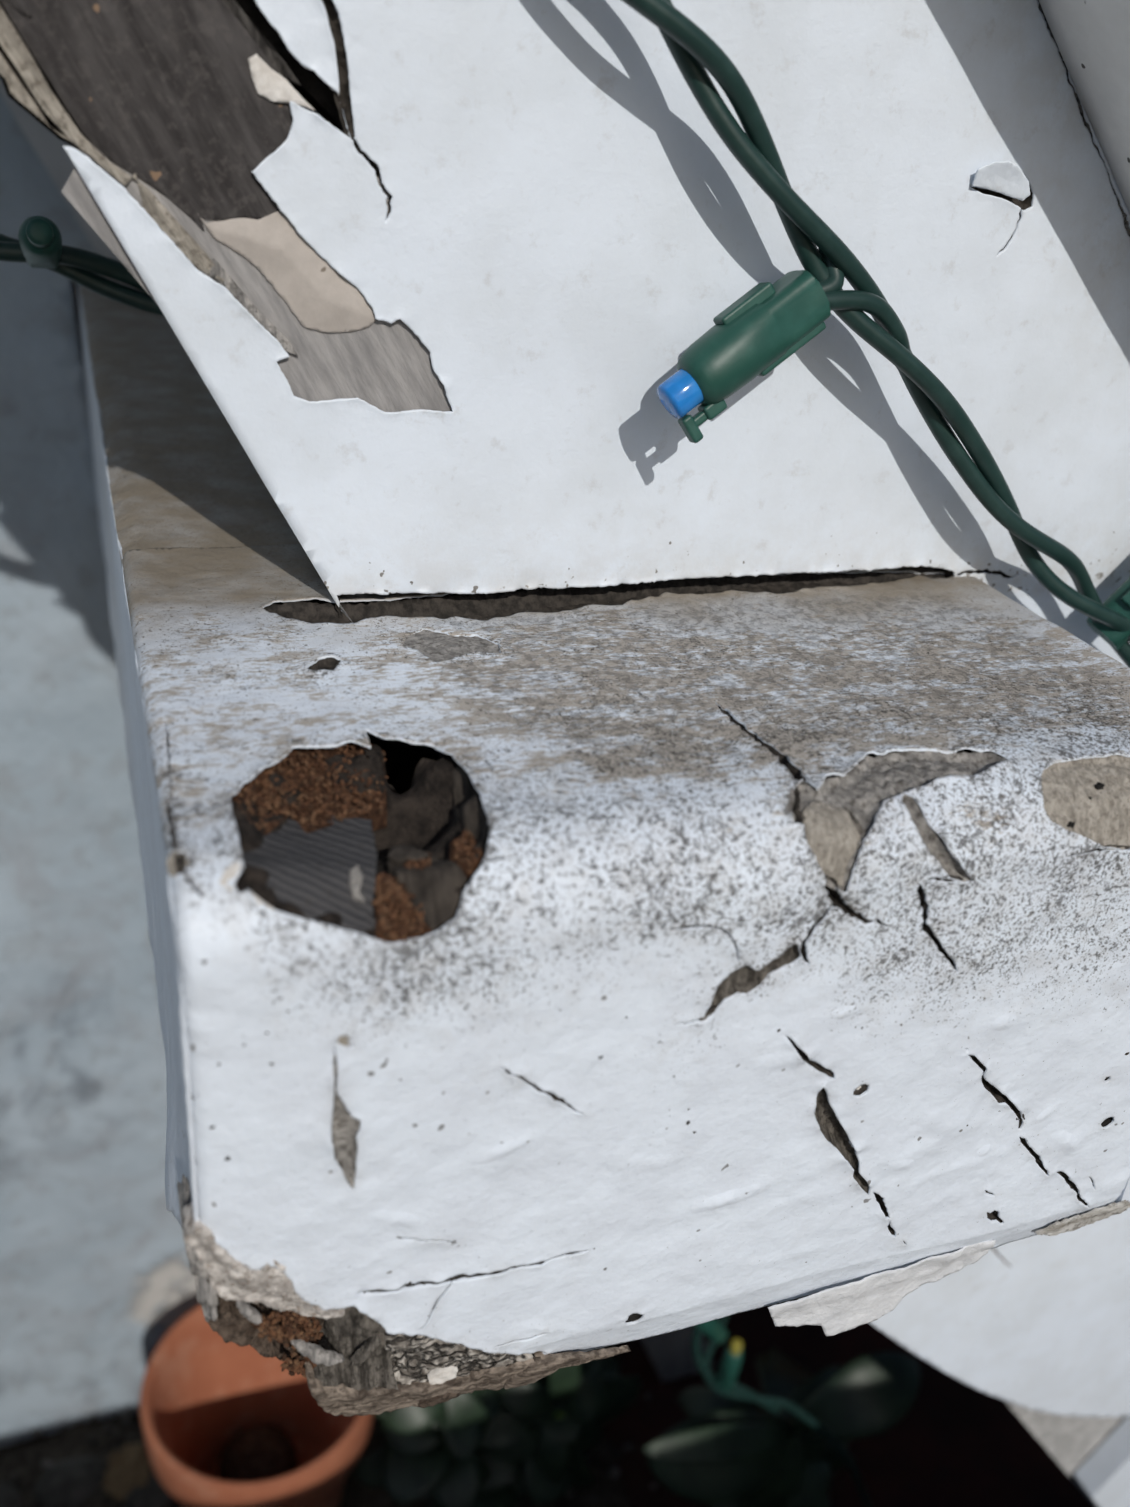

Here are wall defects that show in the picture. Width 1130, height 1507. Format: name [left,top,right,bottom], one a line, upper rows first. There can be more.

crack [322,0,392,219]
peeling [0,0,452,412]
crack [679,706,1008,1024]
spalling [900,791,972,882]
peeling [1041,755,1130,855]
peeling [332,1036,361,1189]
crack [504,1069,576,1111]
crack [785,1035,906,1244]
crack [969,1055,1094,1205]
spalling [133,1174,631,1417]
crack [362,1241,577,1317]
peeling [768,1240,996,1336]